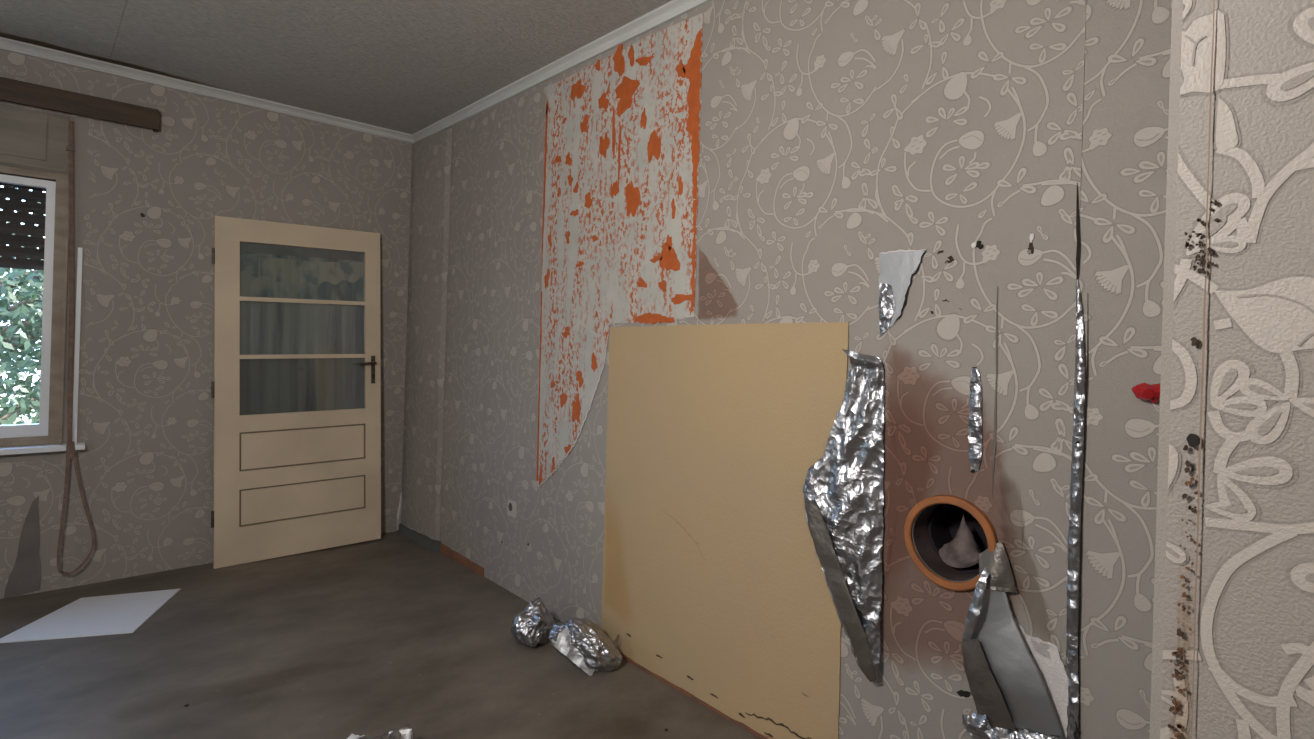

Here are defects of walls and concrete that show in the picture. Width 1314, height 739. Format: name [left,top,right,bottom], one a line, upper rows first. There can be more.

flaking render [536,13,849,739]
damp [1185,200,1219,277]